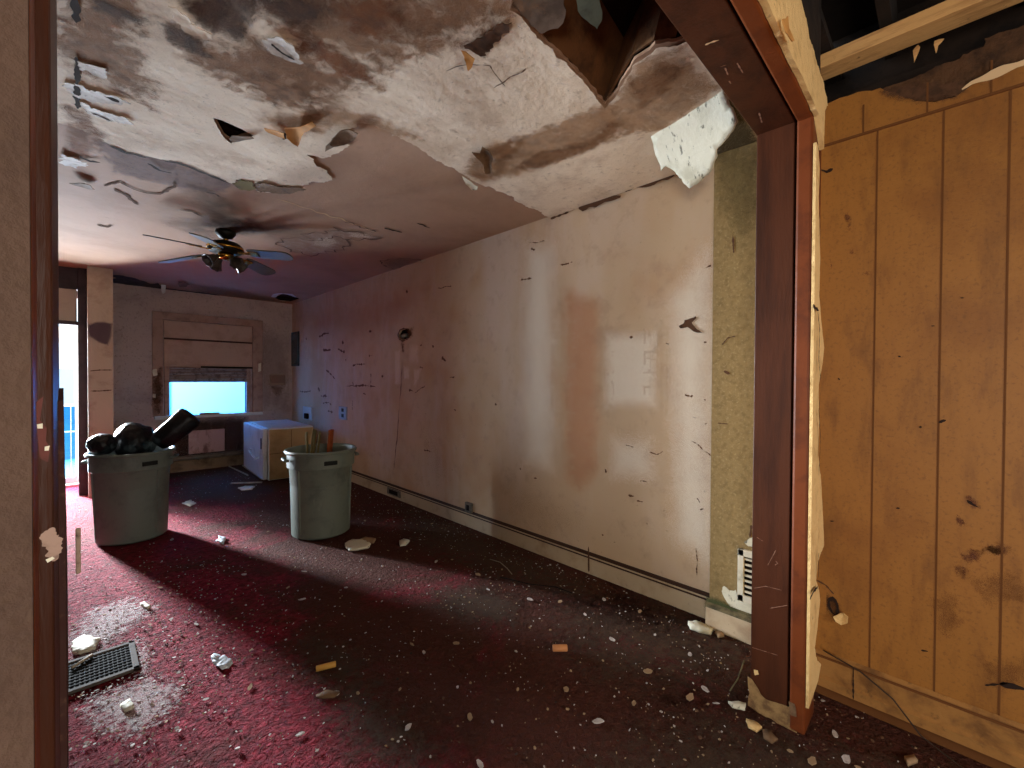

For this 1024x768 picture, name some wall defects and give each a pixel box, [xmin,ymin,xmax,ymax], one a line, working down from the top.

leakage [57,0,548,142]
peeling [57,0,722,220]
leakage [461,43,719,182]
leakage [878,78,967,104]
flaking render [39,527,63,563]